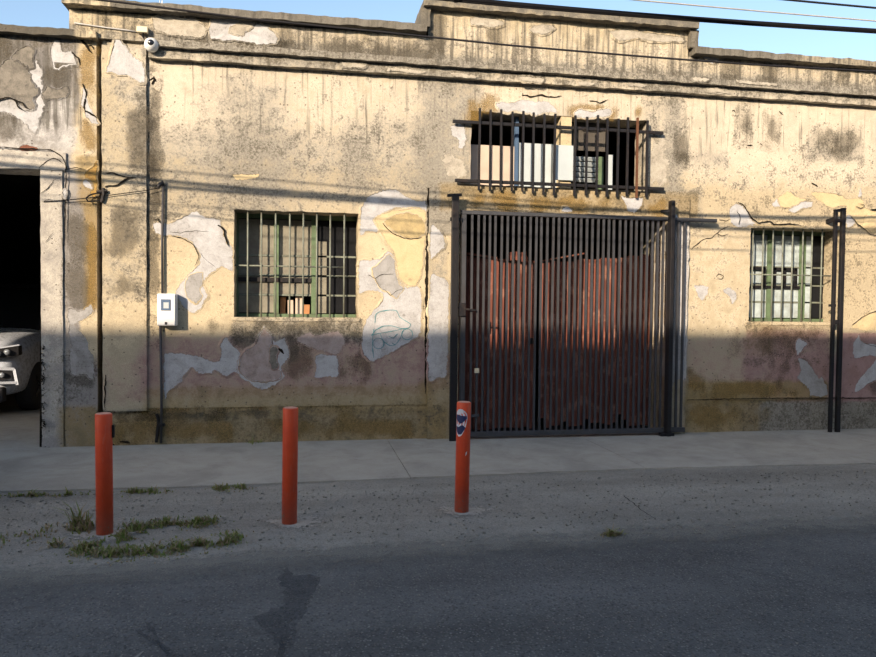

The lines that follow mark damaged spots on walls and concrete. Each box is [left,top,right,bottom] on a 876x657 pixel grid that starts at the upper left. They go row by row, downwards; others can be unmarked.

flaking render [0,39,80,152]
peeling [105,39,147,85]
leakage [127,90,164,177]
peeling [151,14,281,47]
peeling [494,98,559,117]
peeling [573,107,613,120]
leakage [111,190,161,291]
peeling [152,210,235,314]
peeling [356,187,451,383]
peeling [727,187,876,237]
peeling [162,325,347,400]
peeling [851,310,876,393]